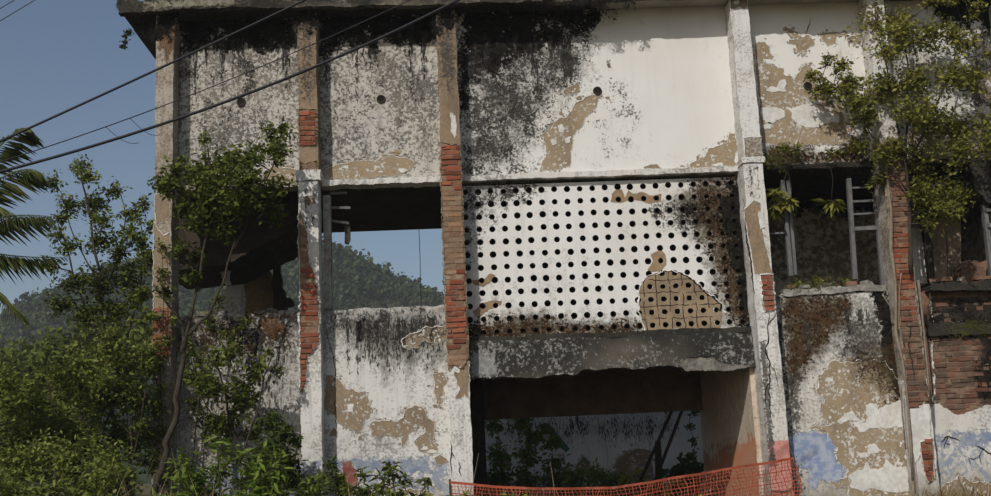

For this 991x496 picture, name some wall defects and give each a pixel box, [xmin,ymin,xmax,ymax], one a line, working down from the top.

damp [115,0,636,264]
flaking render [536,82,640,172]
flaking render [674,27,863,176]
damp [328,303,447,383]
flaking render [324,113,502,465]
damp [467,309,644,379]
spalling [637,251,723,331]
flaking render [744,200,777,313]
damp [648,133,874,327]
damp [759,340,778,467]
damp [775,288,900,496]
flaking render [809,121,991,496]